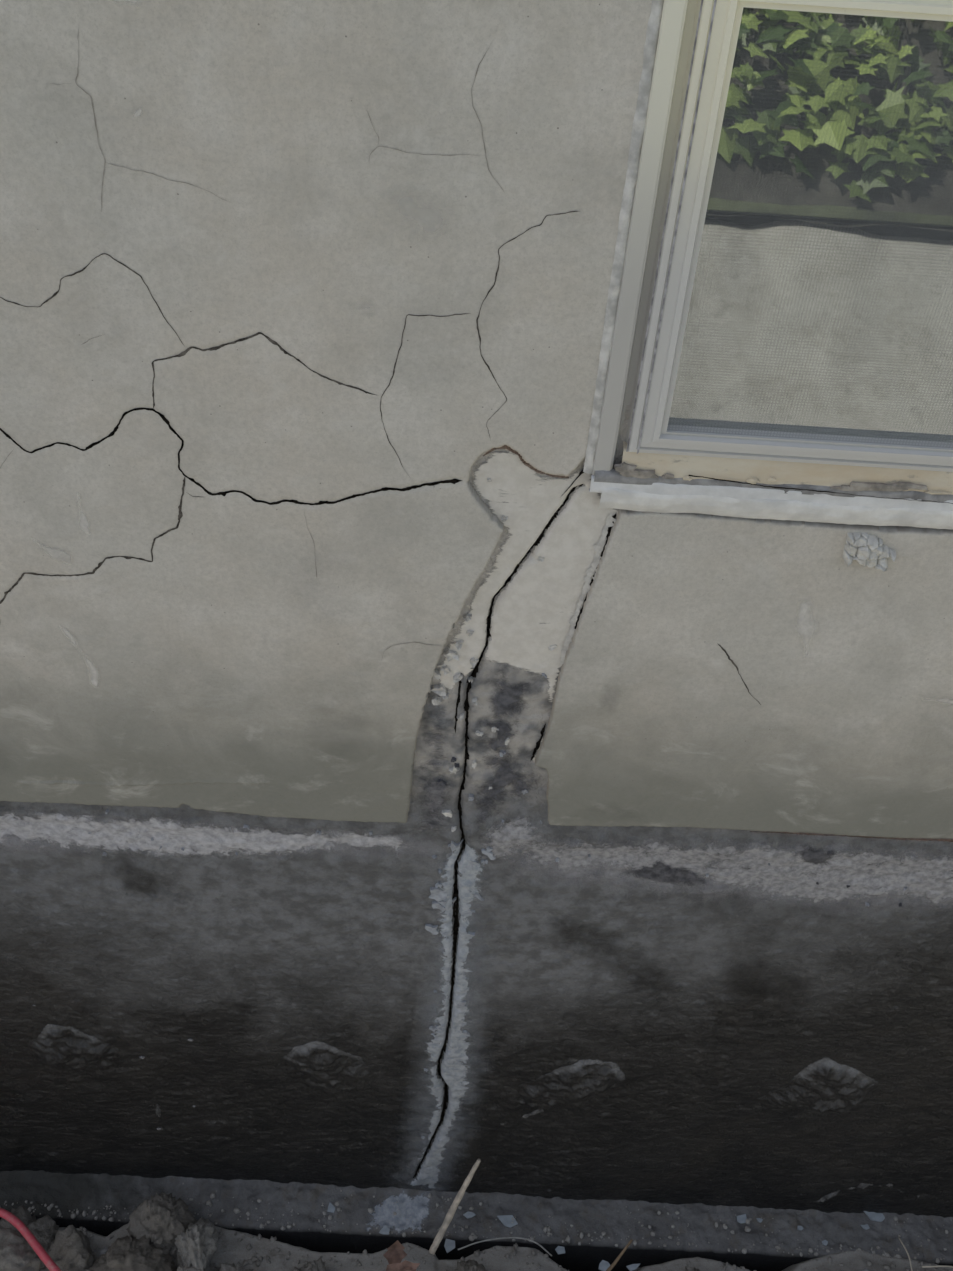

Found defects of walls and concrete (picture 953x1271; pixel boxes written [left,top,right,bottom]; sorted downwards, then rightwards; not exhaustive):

crack [52,29,229,211]
crack [366,48,504,191]
crack [0,211,578,604]
spalling [421,452,619,832]
crack [560,513,617,665]
crack [718,644,761,705]
leakage [0,809,417,856]
crack [413,468,585,1178]
leakage [367,817,953,1233]